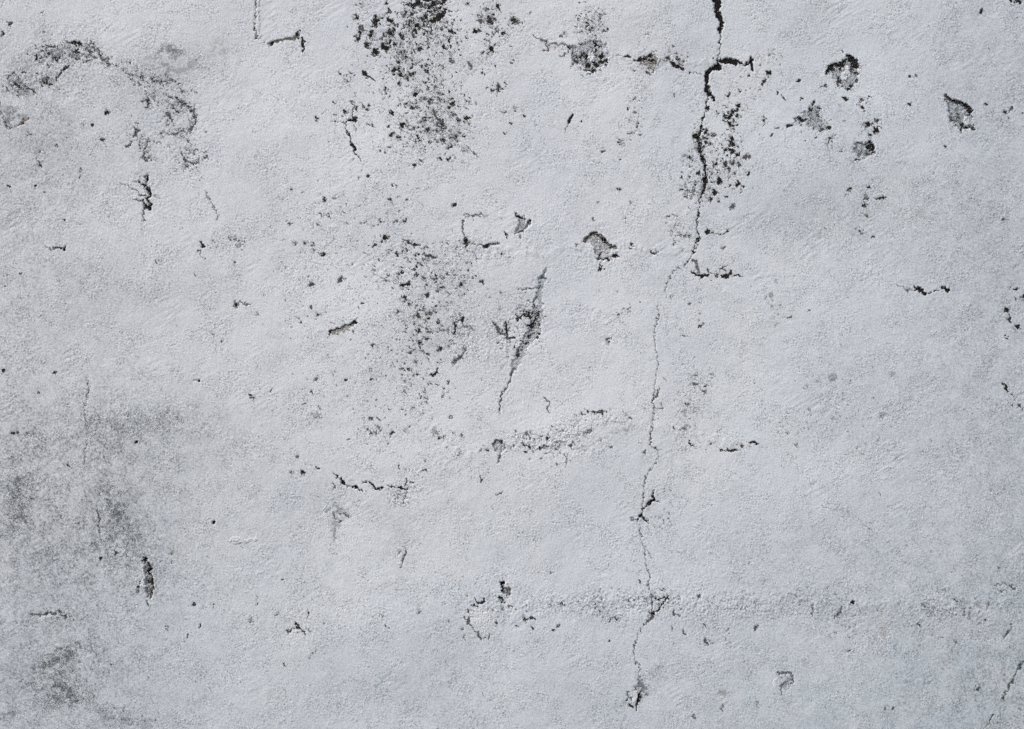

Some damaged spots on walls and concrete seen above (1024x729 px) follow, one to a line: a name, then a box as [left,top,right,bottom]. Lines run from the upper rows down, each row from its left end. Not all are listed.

spalling [820,50,872,109]
spalling [944,94,976,132]
spalling [575,217,619,272]
crack [900,286,950,296]
crack [631,0,754,682]
crack [333,473,414,507]
spalling [133,557,155,607]